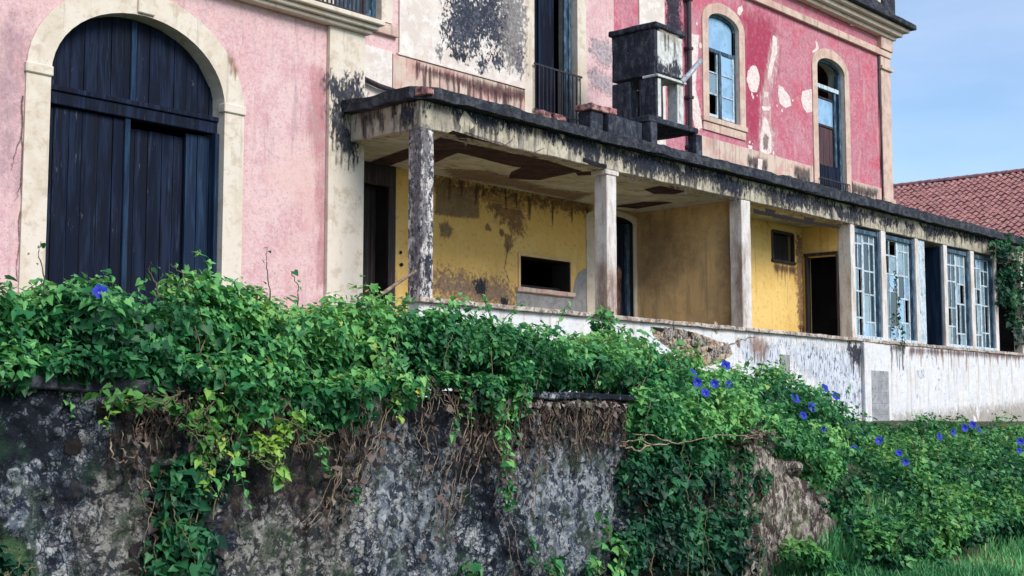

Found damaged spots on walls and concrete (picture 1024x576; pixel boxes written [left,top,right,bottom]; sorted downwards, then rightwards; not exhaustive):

peeling [747,34,812,156]
peeling [420,124,527,281]
spalling [575,157,607,176]
water stain [322,0,995,306]
peeling [650,321,862,419]
water stain [847,340,861,375]
water stain [891,345,1023,369]